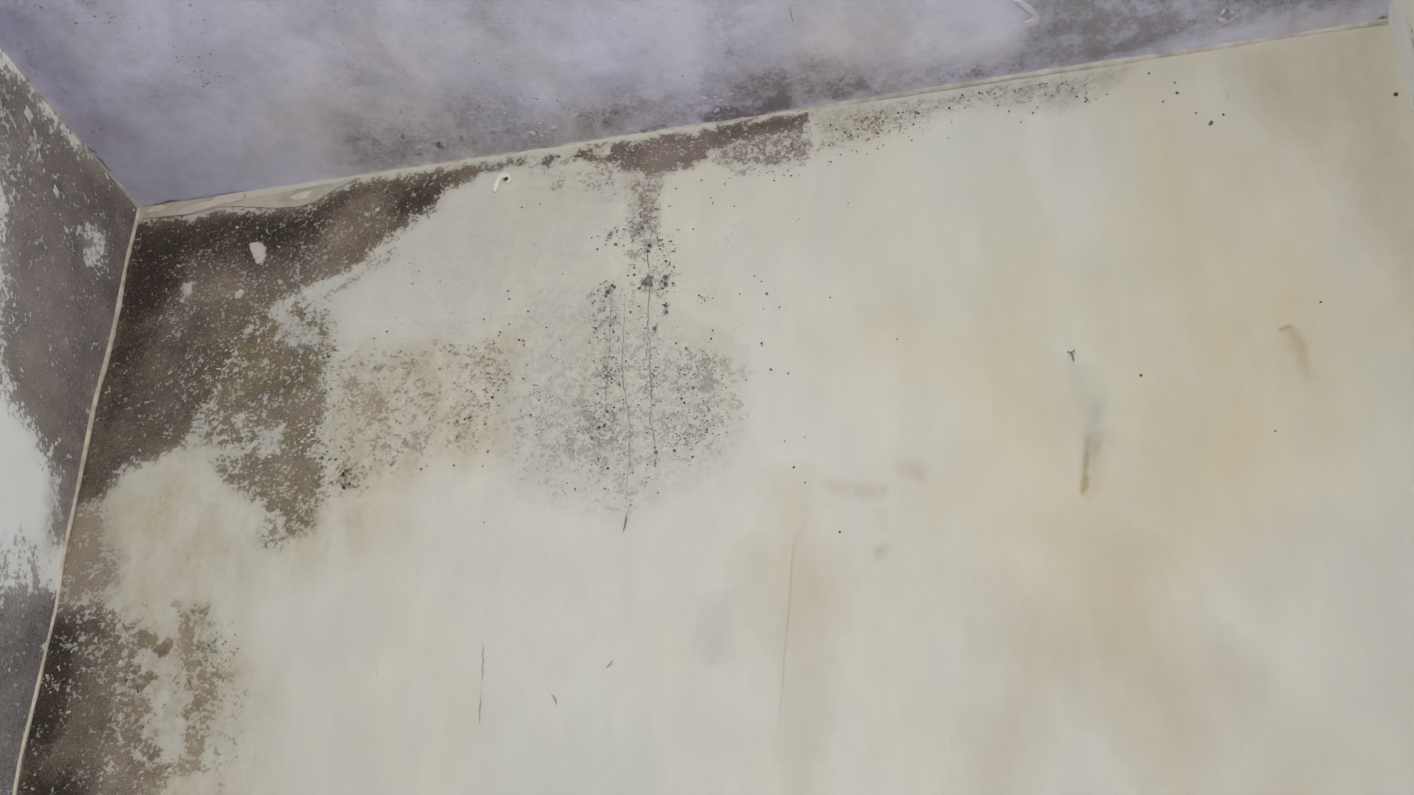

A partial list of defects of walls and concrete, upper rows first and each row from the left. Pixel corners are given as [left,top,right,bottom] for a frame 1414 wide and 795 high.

water stain [1035,0,1294,62]
water stain [0,58,1108,795]